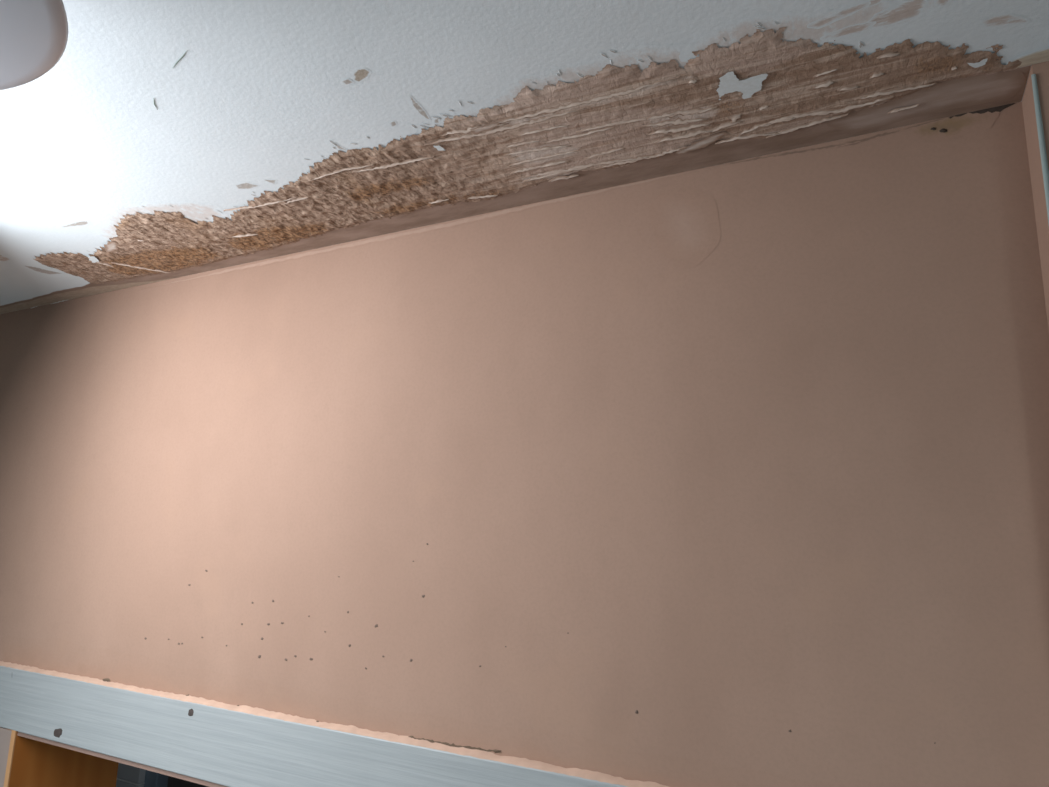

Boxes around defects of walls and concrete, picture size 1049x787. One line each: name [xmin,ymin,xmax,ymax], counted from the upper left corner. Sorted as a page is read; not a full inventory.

peeling [34,0,1022,284]